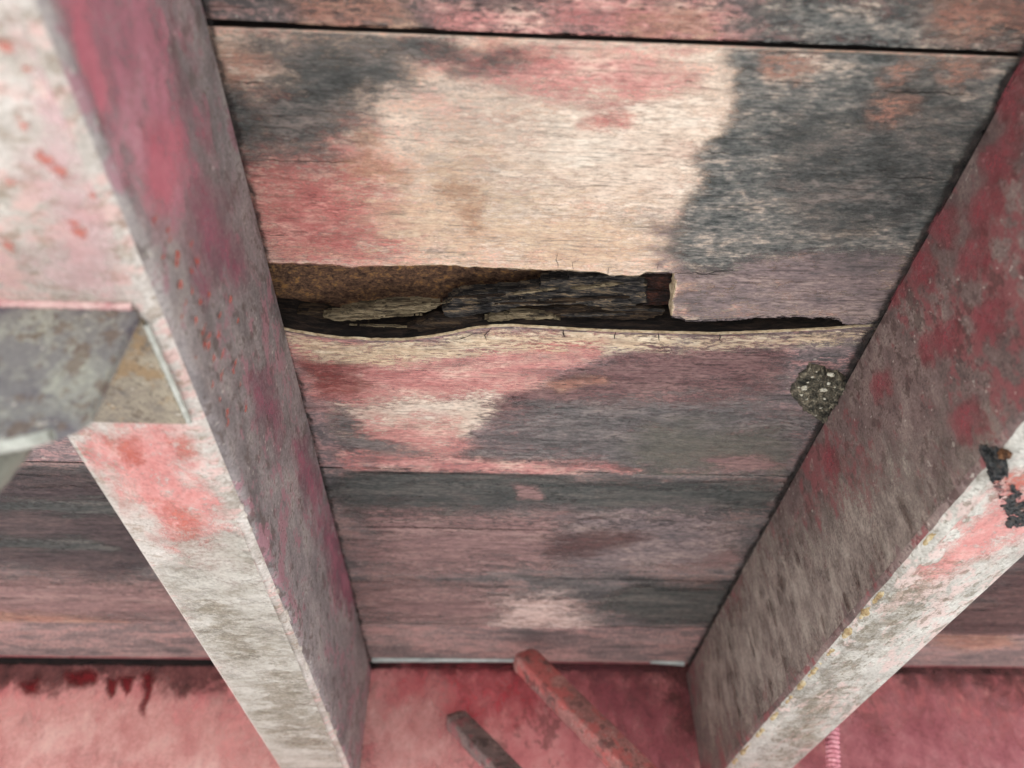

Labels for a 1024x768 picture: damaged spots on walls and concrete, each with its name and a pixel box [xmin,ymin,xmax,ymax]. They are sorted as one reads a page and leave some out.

damp [201,0,522,266]
damp [651,0,1024,383]
crack [657,264,733,275]
damp [20,679,38,695]
damp [66,670,154,714]